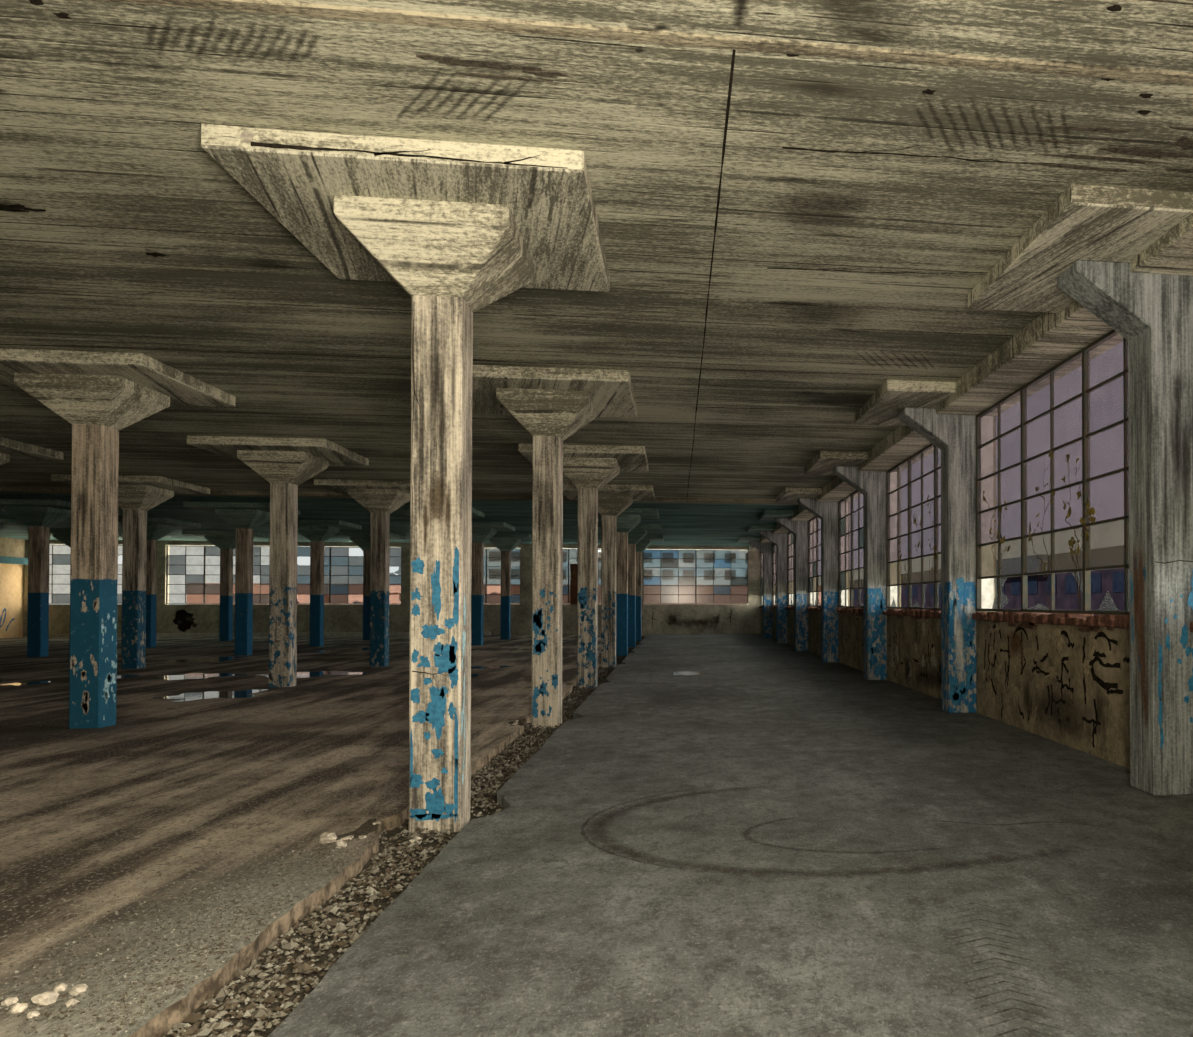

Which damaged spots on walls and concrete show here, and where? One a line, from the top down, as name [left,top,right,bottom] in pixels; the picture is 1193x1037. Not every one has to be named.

crack [687,50,751,497]
peeling [70,580,117,720]
peeling [410,546,466,822]
peeling [532,669,558,718]
peeling [533,588,558,656]
peeling [578,589,595,666]
peeling [839,577,1041,706]